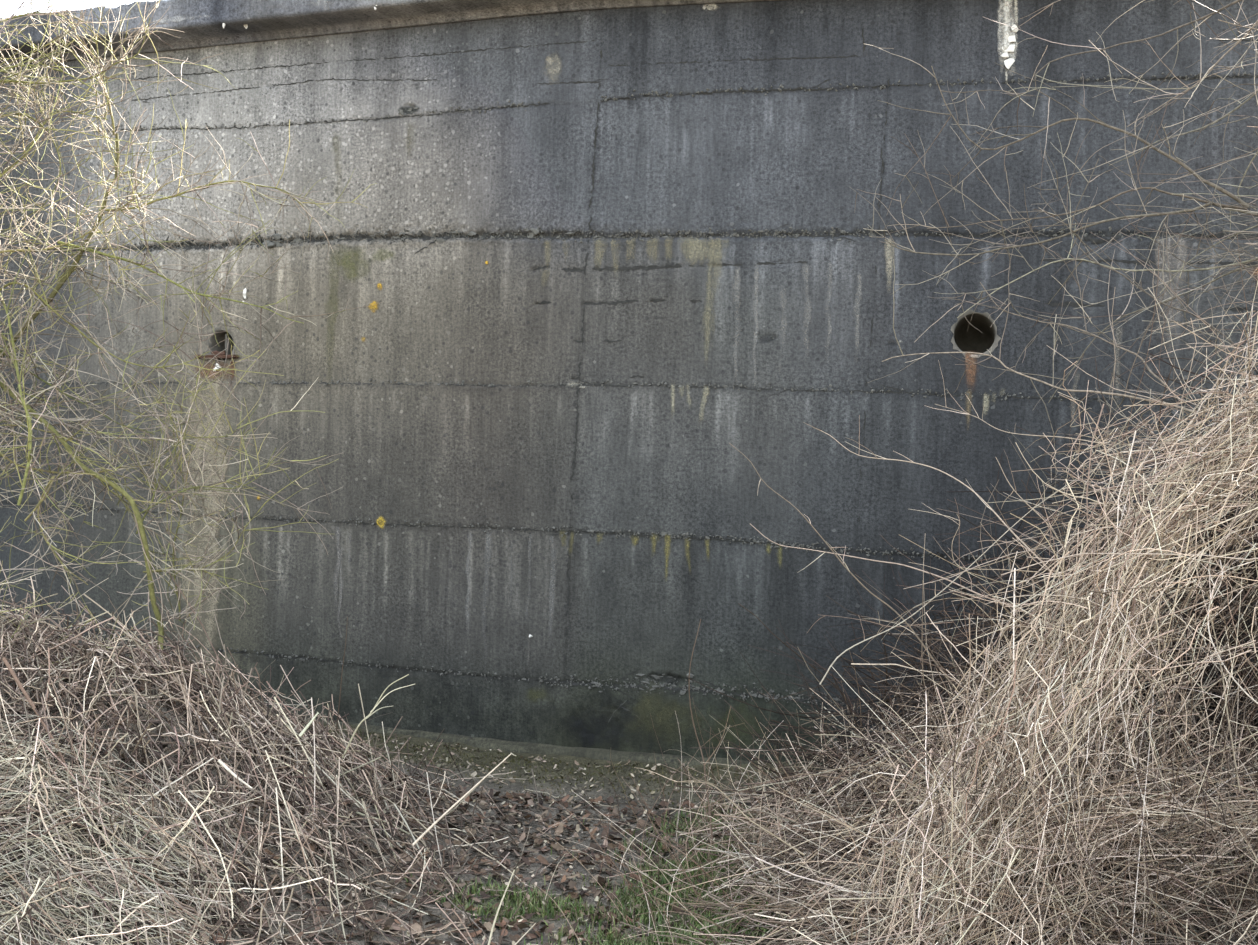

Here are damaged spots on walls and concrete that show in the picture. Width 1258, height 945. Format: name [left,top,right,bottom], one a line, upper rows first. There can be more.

leakage [998,0,1018,80]
leakage [885,239,894,281]
leakage [648,238,721,353]
leakage [671,385,709,417]
rust [965,353,978,422]